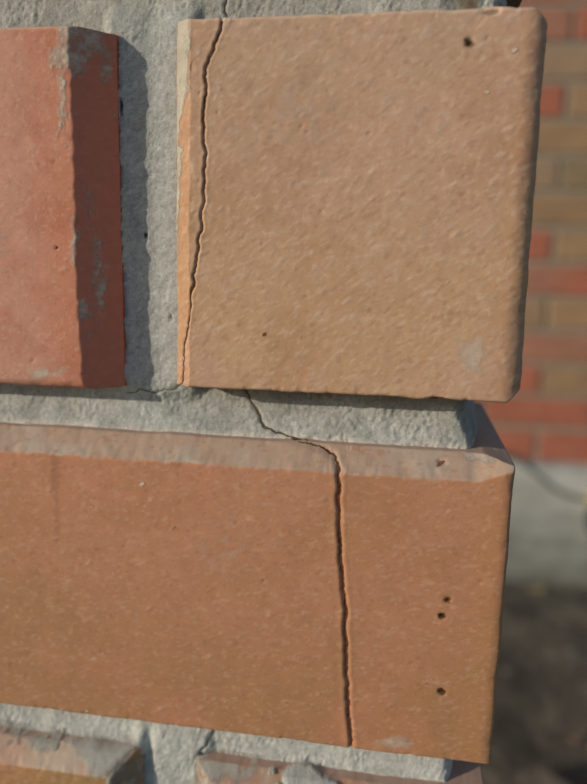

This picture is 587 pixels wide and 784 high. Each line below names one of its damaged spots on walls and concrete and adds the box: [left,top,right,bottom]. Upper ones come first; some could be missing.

crack [128,0,227,393]
crack [244,390,353,745]
peeling [268,762,336,784]